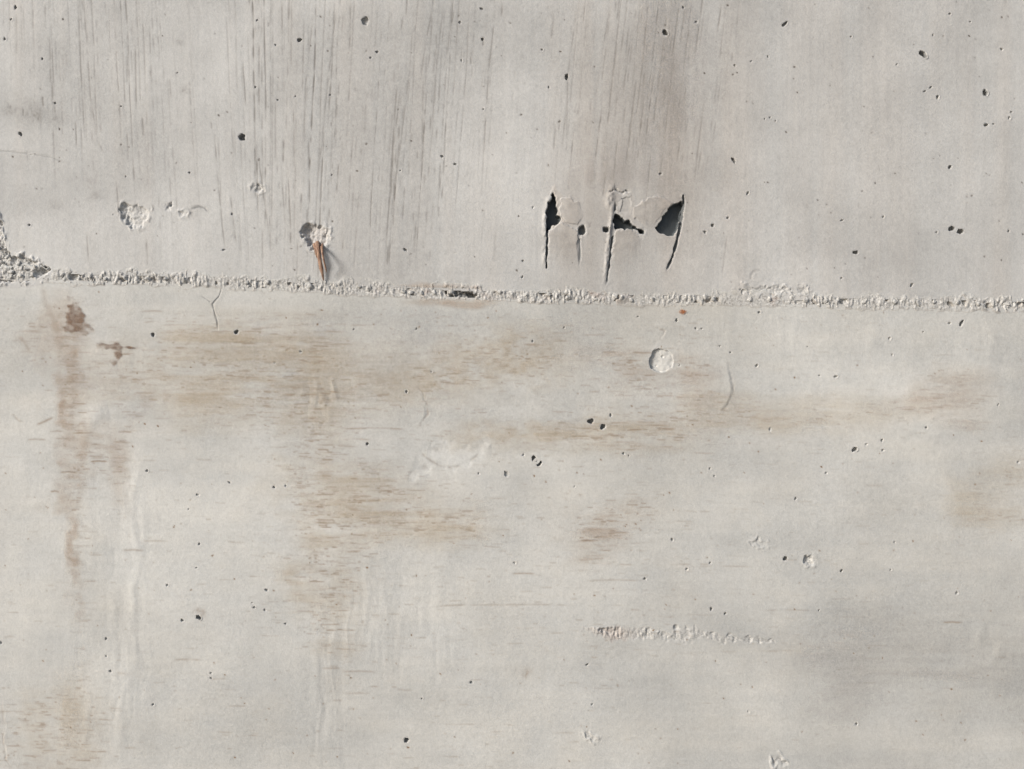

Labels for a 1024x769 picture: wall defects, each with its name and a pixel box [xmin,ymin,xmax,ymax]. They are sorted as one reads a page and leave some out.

spalling [113,196,193,235]
peeling [547,193,674,271]
corrosion [67,305,85,331]